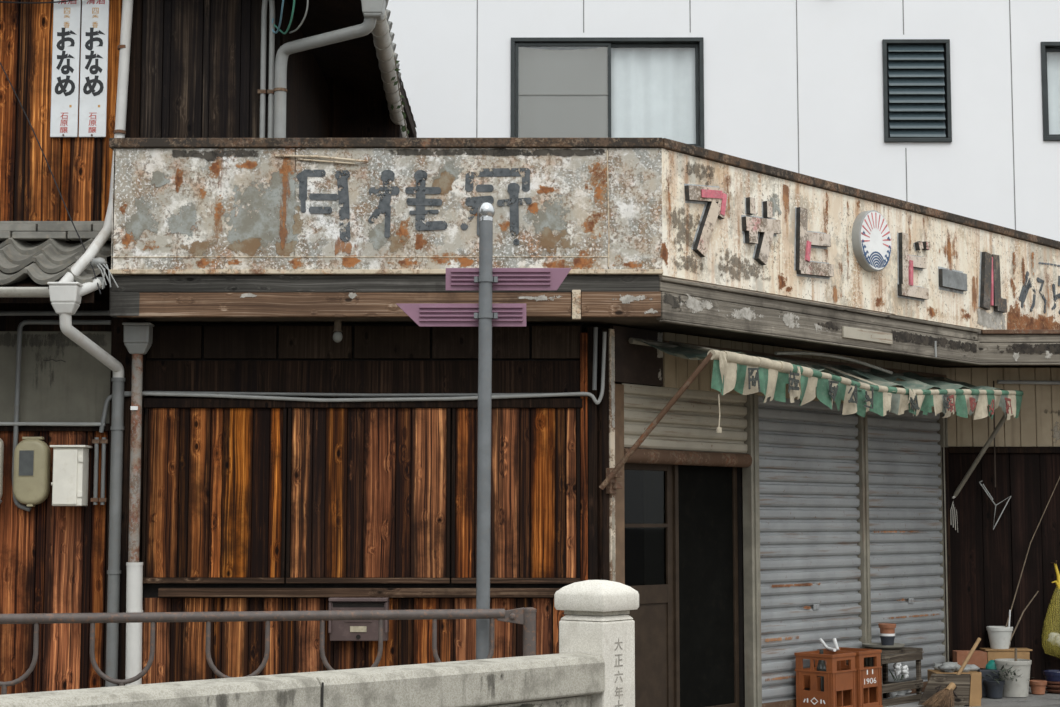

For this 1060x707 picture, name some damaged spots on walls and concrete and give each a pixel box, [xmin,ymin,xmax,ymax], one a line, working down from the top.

peeling [124,171,214,257]
peeling [224,171,304,258]
corrosion [279,157,304,269]
corrosion [335,238,361,268]
corrosion [527,185,558,214]
corrosion [542,162,607,269]
peeling [686,162,714,185]
peeling [667,206,770,281]
peeling [680,294,764,320]
peeling [779,313,800,328]
corrosion [961,277,978,321]
corrosion [981,252,1060,334]